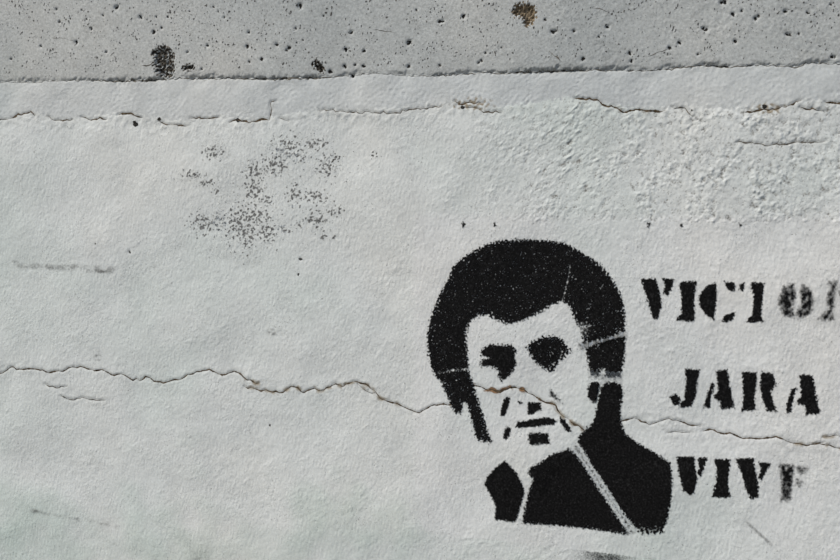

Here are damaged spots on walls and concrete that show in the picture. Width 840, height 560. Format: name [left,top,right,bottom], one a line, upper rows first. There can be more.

crack [0,46,840,83]
crack [0,101,284,127]
crack [319,98,499,114]
crack [575,97,689,113]
crack [745,100,840,113]
crack [739,133,839,146]
crack [0,366,451,413]
crack [475,385,584,430]
crack [619,418,838,448]